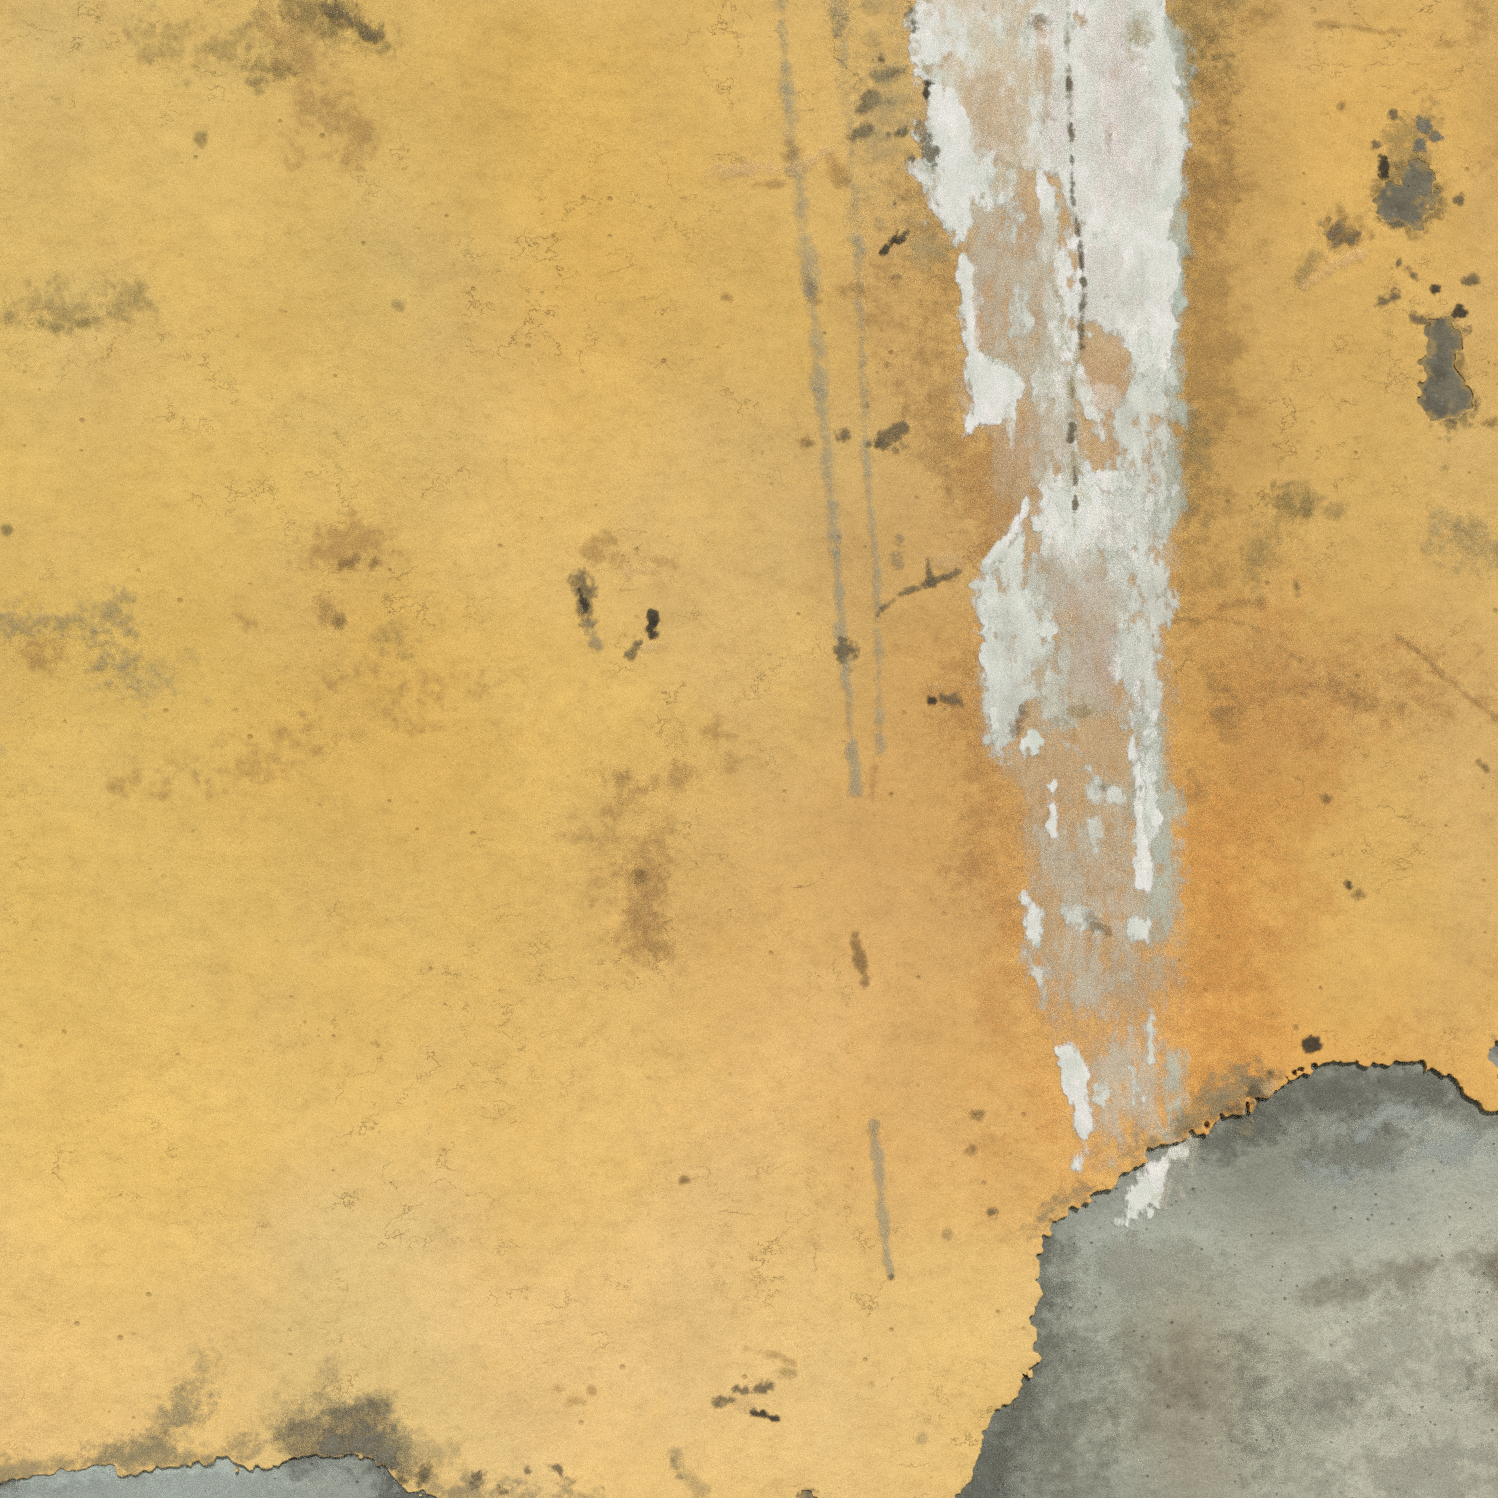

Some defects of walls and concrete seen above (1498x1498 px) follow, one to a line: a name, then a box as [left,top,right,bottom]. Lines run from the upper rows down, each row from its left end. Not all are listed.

water stain [834,636,860,662]
peeling [848,0,1498,1498]
flaking render [0,1453,437,1498]